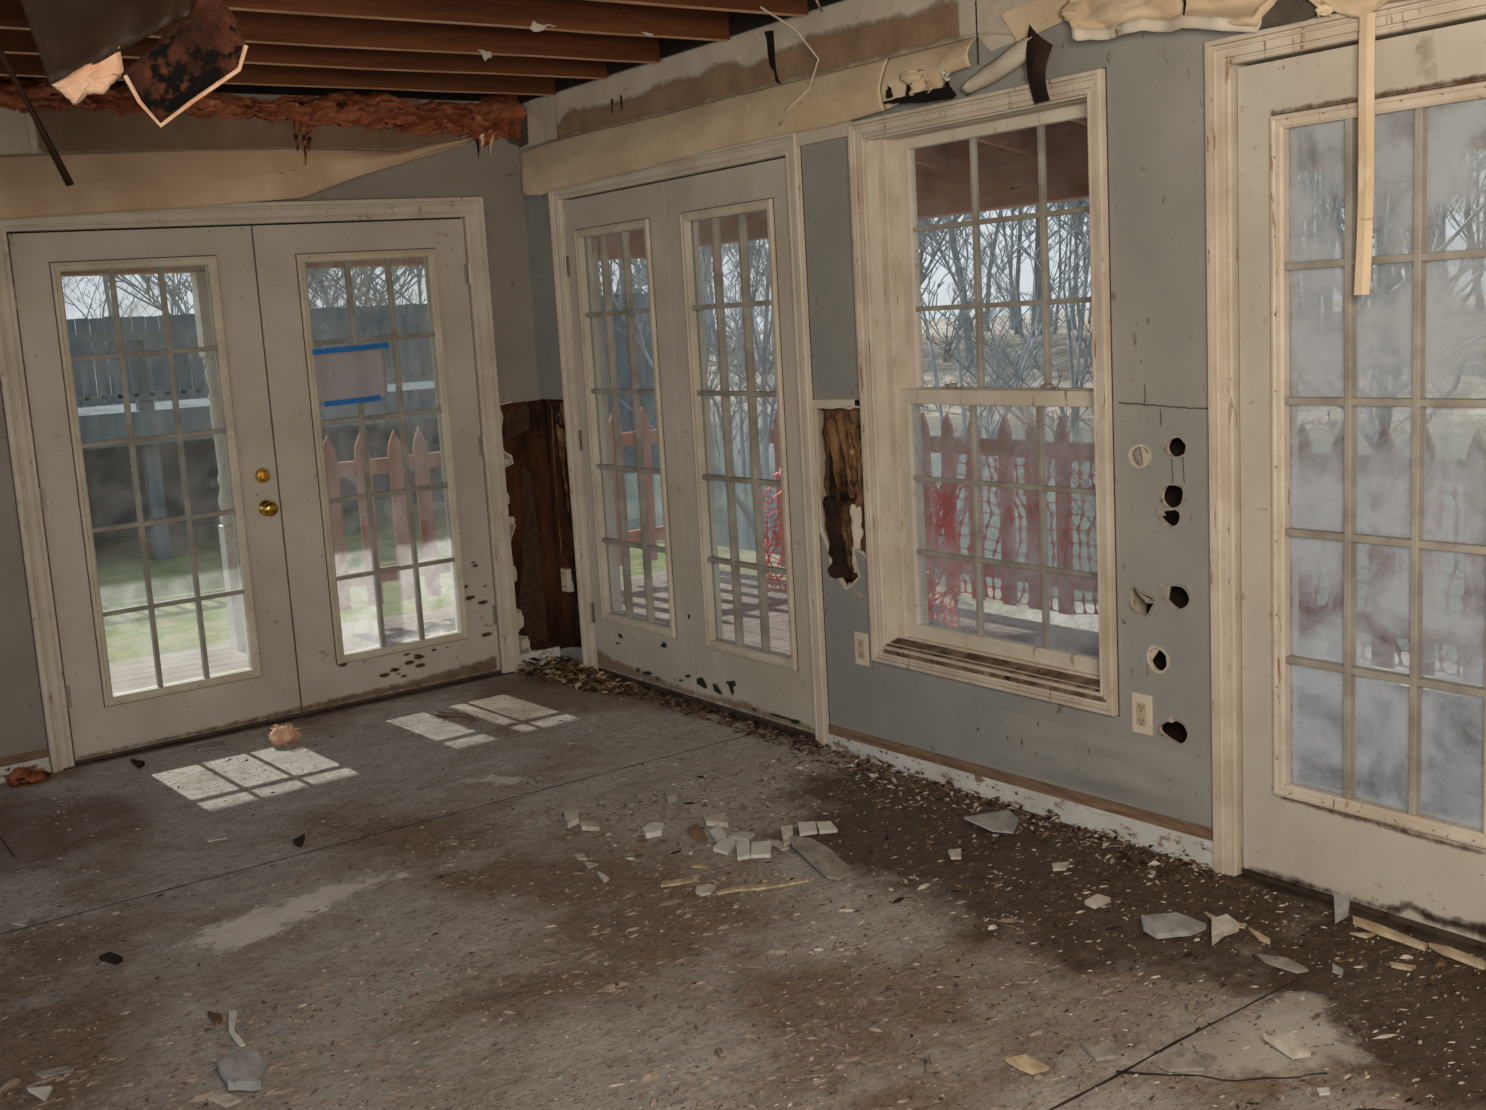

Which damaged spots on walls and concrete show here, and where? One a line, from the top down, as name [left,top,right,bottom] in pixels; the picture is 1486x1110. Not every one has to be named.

flaking render [0,113,182,155]
flaking render [521,0,1016,148]
spalling [500,399,582,652]
spalling [812,399,869,609]